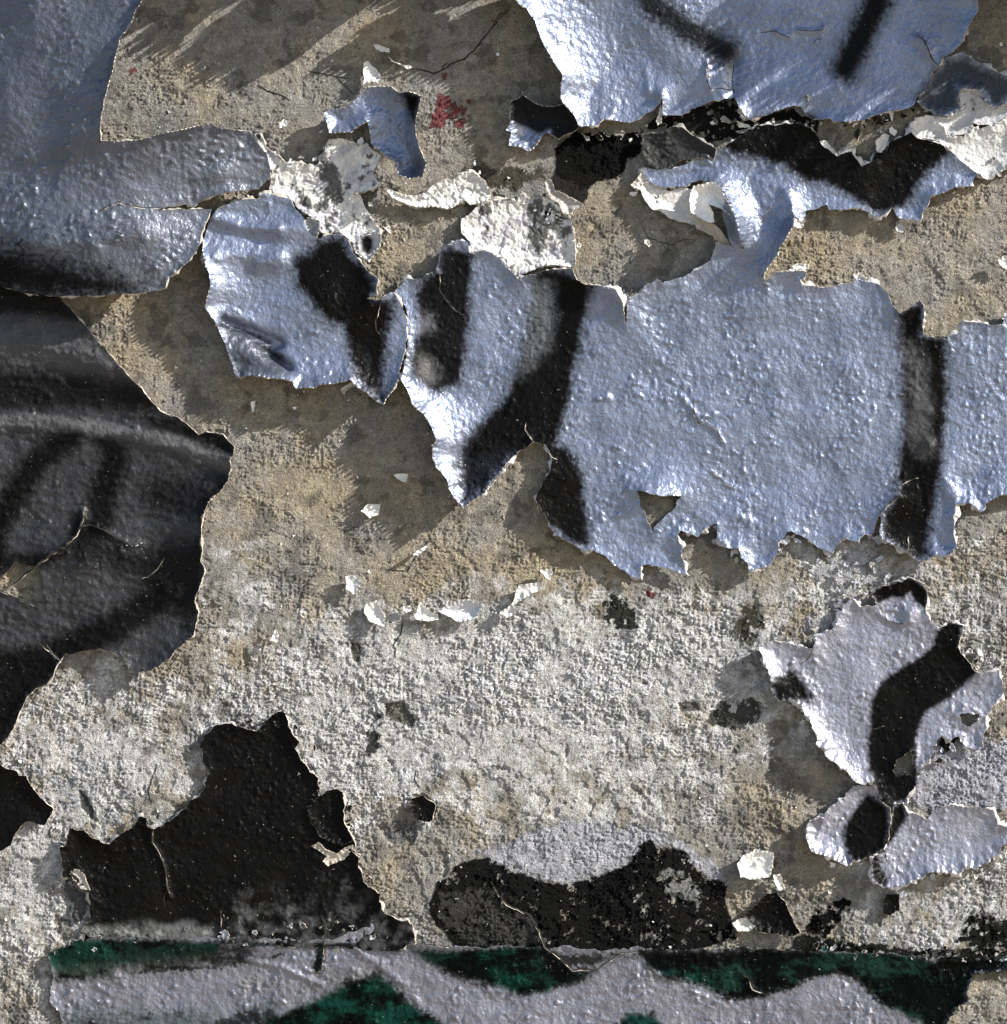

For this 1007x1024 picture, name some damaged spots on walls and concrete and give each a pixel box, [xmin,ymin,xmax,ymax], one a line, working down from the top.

crack [406,8,511,74]
peeling [0,0,1007,746]
peeling [48,711,1007,1024]
peeling [758,562,1007,915]